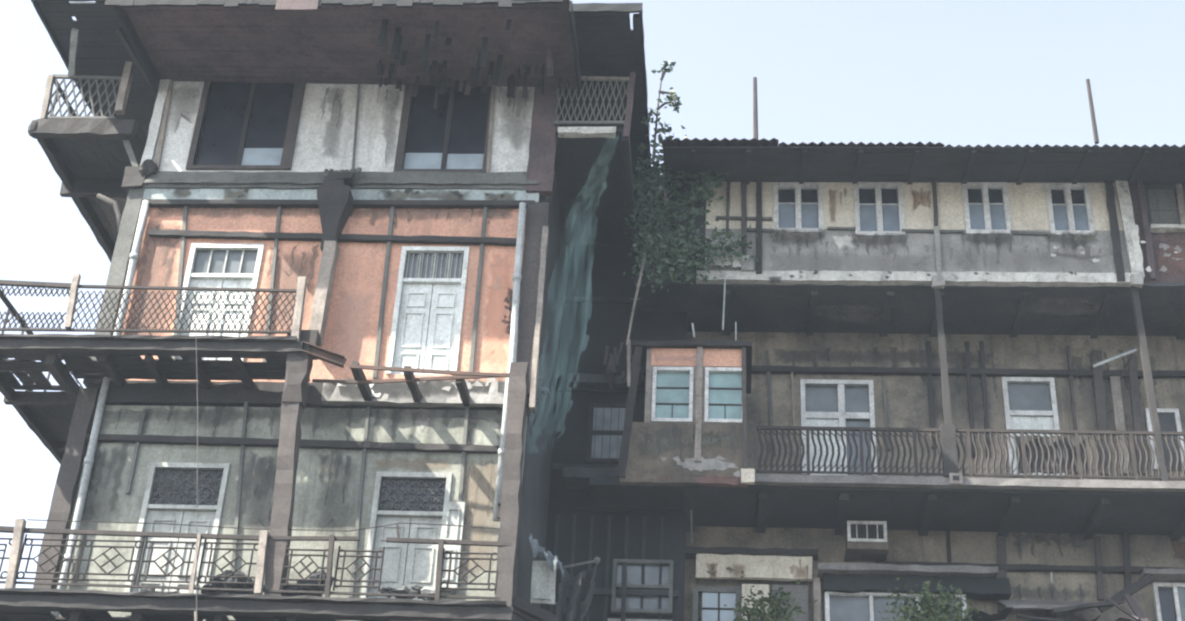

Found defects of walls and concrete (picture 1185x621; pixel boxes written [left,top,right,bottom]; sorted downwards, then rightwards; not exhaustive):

damp [770,230,824,244]
damp [852,234,907,244]
damp [966,233,1011,244]
damp [1046,232,1096,245]
flaking render [1131,224,1185,275]
peeling [649,455,740,485]